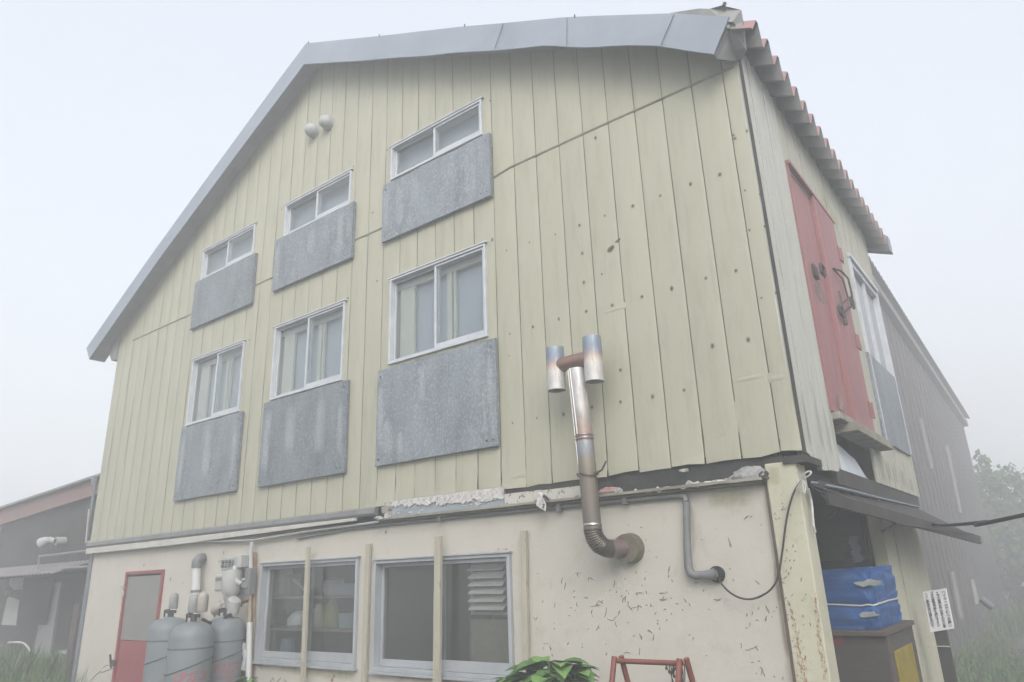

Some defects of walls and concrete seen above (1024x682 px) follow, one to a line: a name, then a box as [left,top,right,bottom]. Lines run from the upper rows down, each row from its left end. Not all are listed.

peeling [597,456,765,494]
peeling [384,479,580,518]